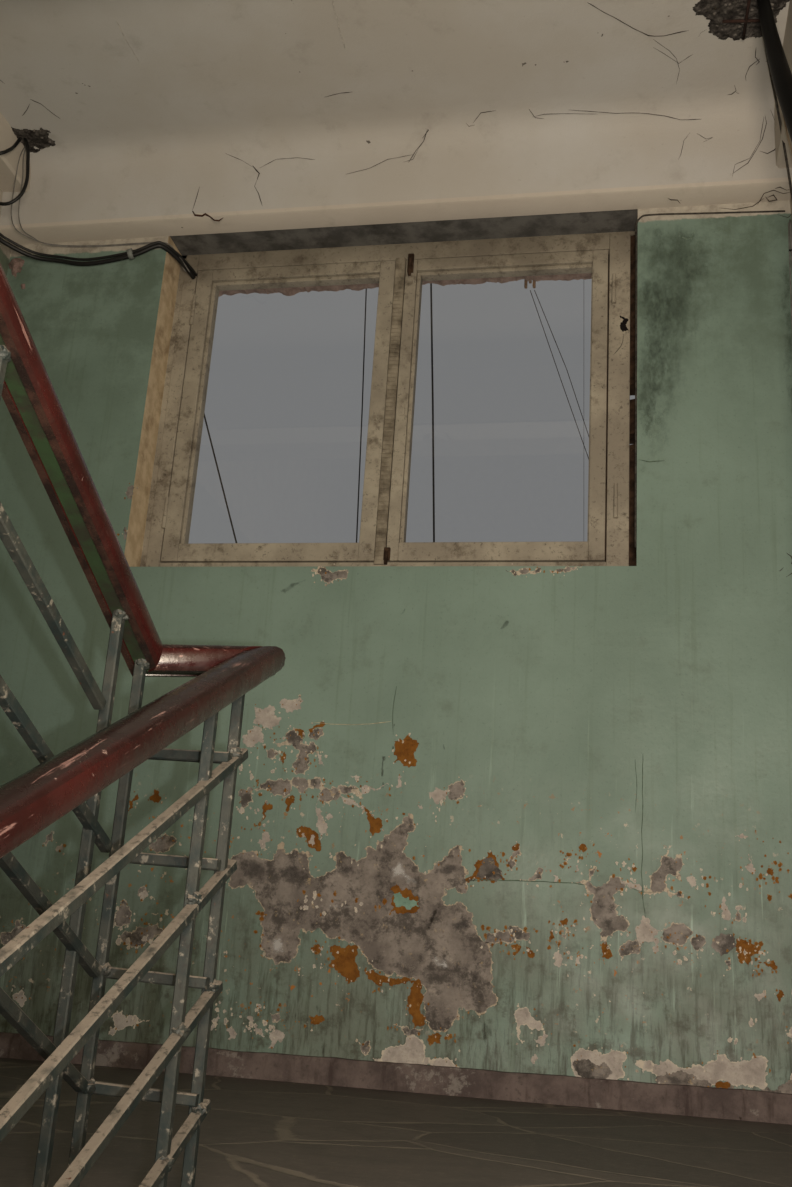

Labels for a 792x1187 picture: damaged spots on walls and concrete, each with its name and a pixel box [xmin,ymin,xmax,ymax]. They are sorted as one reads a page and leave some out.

spalling [693,0,790,41]
flaking render [211,695,792,1067]
flaking render [635,1037,792,1094]